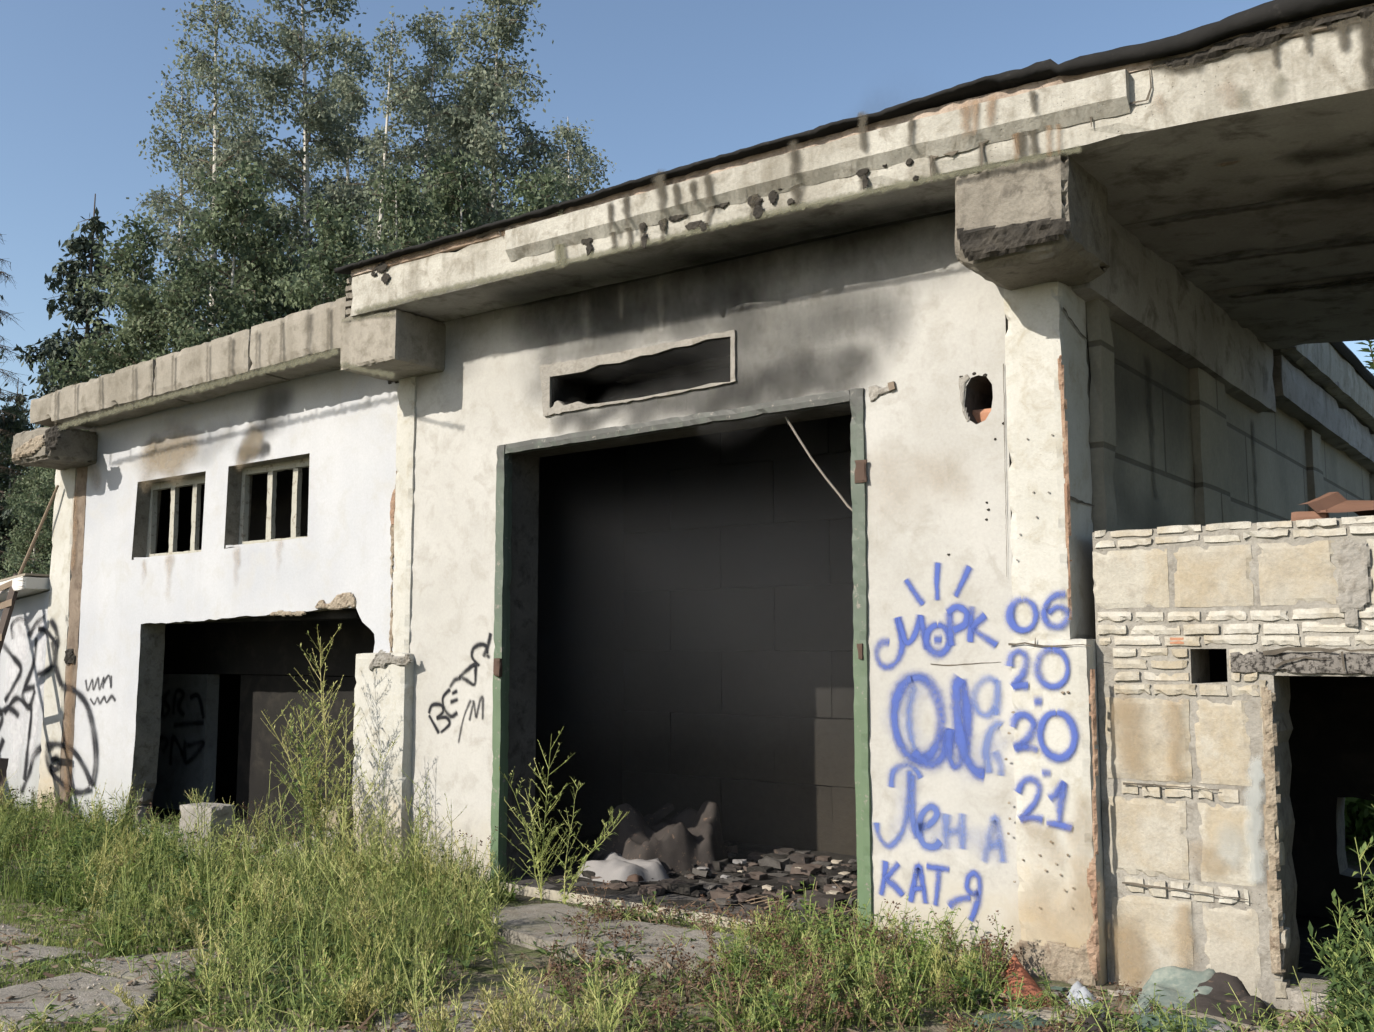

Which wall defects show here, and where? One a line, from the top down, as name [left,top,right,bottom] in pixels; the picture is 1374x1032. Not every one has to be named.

spalling [747,188,795,220]
spalling [581,238,593,256]
spalling [640,214,708,249]
spalling [957,217,1071,261]
leakage [54,309,394,429]
spalling [12,426,61,461]
spalling [269,592,356,616]